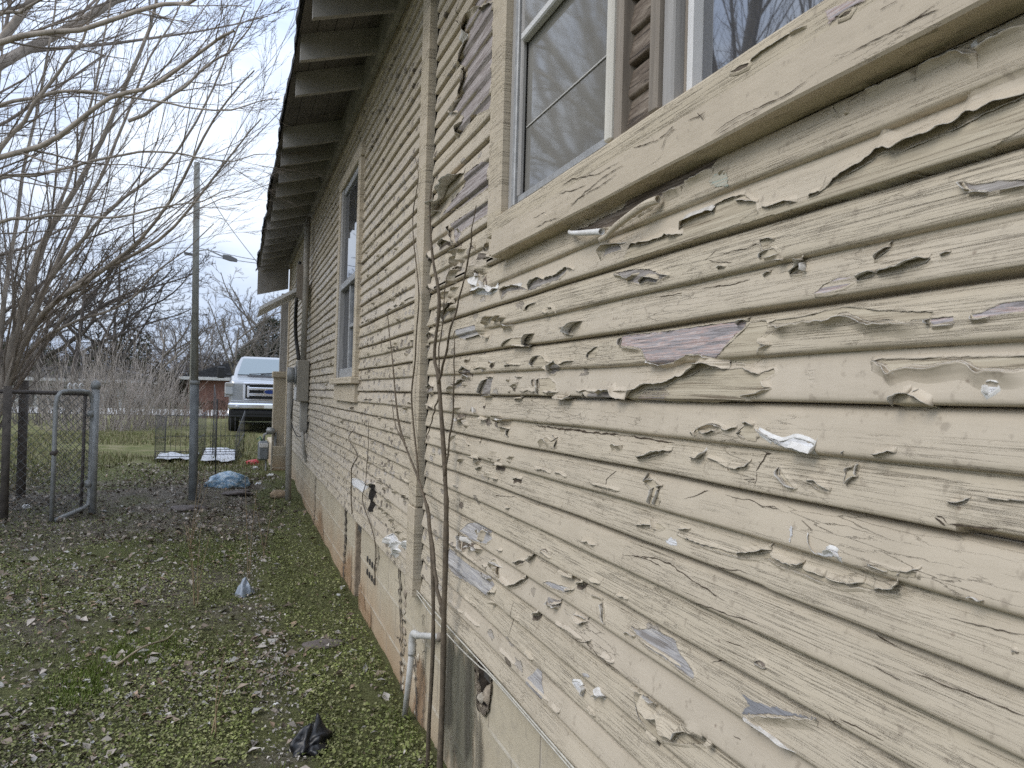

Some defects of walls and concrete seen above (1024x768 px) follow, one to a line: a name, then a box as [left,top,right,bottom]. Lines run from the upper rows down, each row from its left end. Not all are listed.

peeling [448,0,493,139]
crack [852,0,938,52]
crack [534,81,806,227]
peeling [570,69,1024,286]
peeling [424,162,1024,484]
peeling [428,521,629,643]
crack [625,555,758,662]
peeling [635,444,923,599]
crack [934,516,998,530]
crack [951,618,1024,635]
peeling [629,685,713,748]
crack [874,665,1024,716]